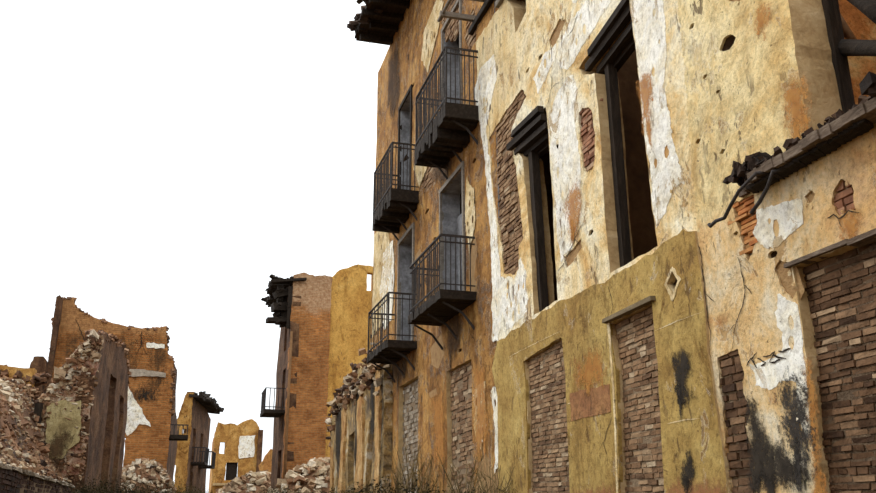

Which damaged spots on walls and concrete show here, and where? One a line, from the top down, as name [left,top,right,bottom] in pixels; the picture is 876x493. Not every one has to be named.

peeling [533,0,611,267]
peeling [630,0,685,227]
peeling [465,178,478,293]
spalling [468,54,529,342]
spalling [832,180,856,215]
leakage [671,348,695,420]
crack [698,246,751,357]
spalling [718,189,815,493]
leakage [668,450,725,493]
leakage [752,475,775,493]